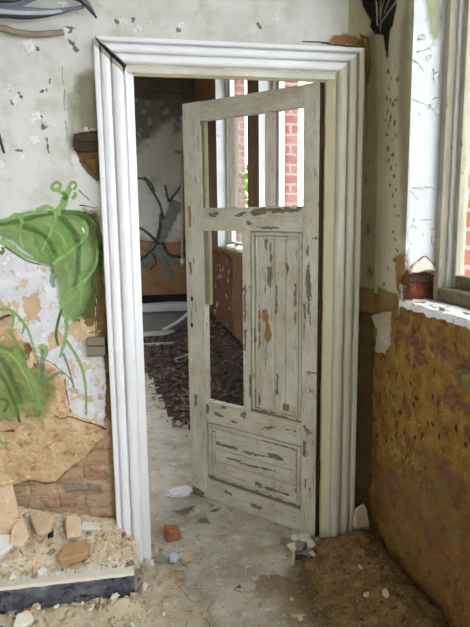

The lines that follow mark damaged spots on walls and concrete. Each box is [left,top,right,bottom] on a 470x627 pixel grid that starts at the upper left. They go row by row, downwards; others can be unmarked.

flaking render [71,147,100,181]
peeling [383,69,399,217]
peeling [0,240,117,521]
flaking render [371,230,470,415]